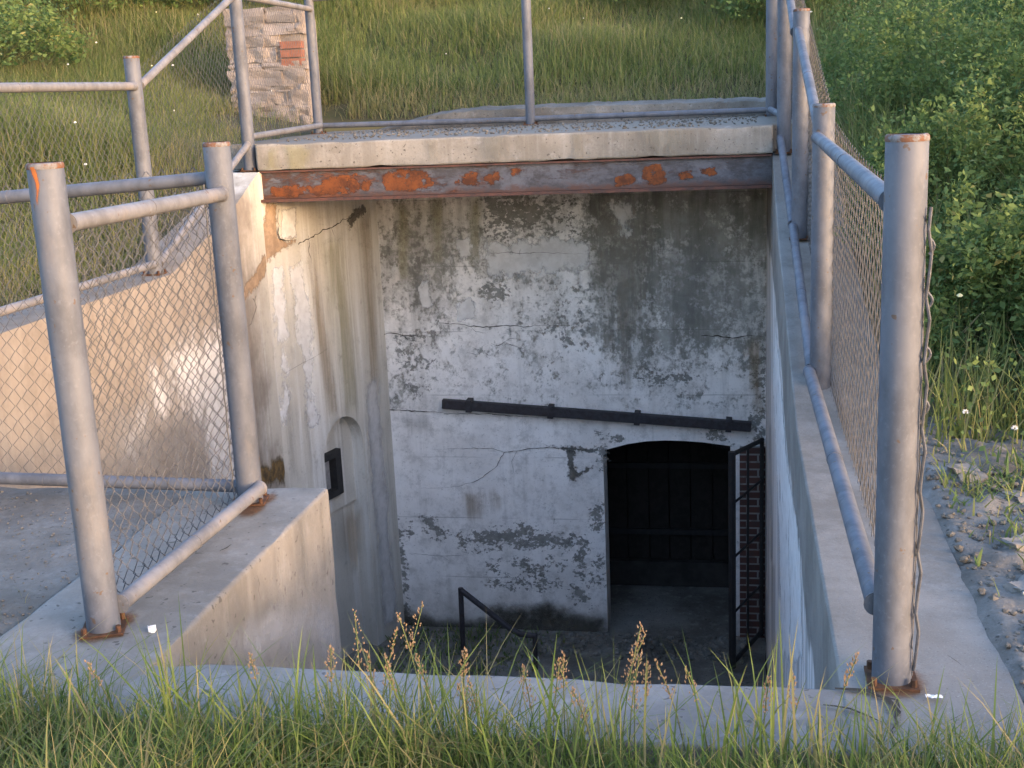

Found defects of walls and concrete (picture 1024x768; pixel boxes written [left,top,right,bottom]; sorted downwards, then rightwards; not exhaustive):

rust [270,168,434,198]
rust [454,168,522,186]
rust [615,164,717,187]
crack [278,211,361,257]
peeling [456,238,473,258]
peeling [476,194,590,244]
peeling [418,271,433,308]
peeling [478,272,511,303]
crack [445,323,564,355]
peeling [542,282,594,372]
crack [436,447,581,487]
peeling [398,503,606,615]